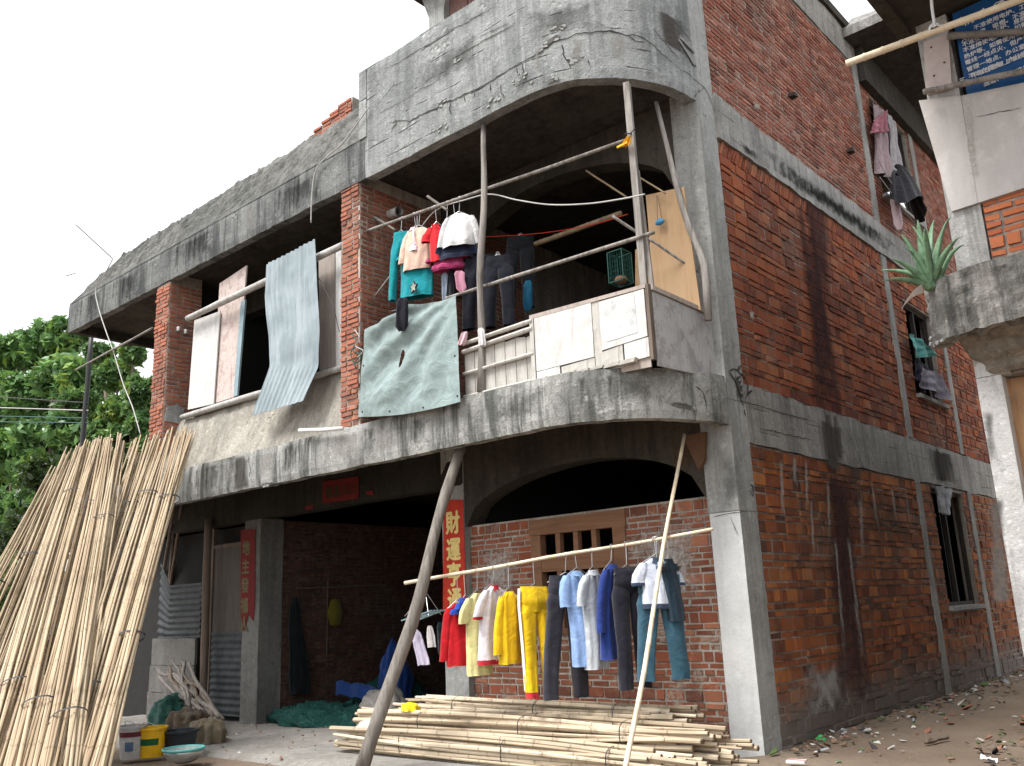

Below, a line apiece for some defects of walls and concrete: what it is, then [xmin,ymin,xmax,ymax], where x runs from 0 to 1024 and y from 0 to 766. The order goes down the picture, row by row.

crack [380,10,715,130]
water stain [774,162,884,400]
water stain [823,415,869,695]